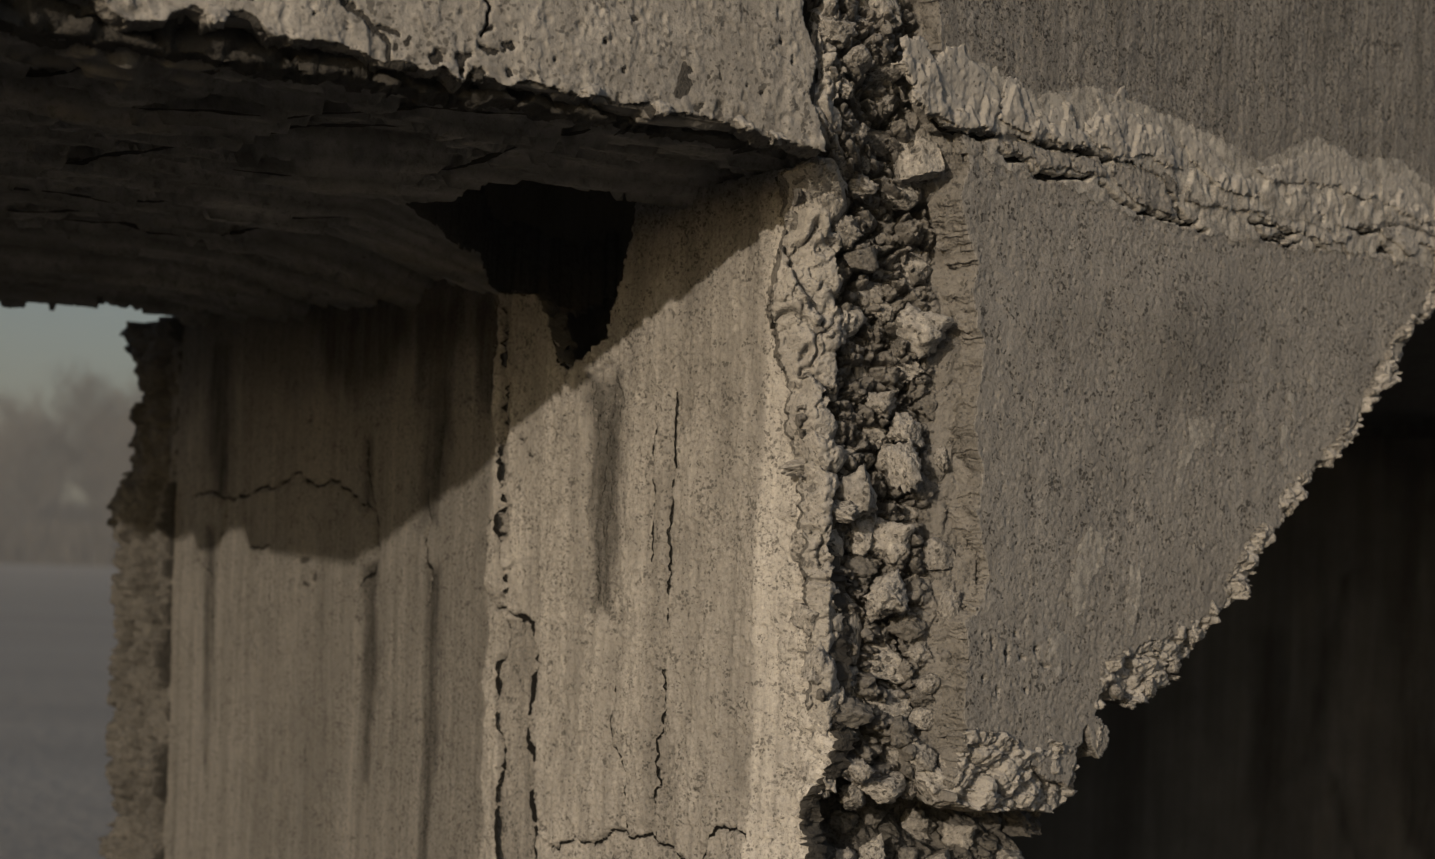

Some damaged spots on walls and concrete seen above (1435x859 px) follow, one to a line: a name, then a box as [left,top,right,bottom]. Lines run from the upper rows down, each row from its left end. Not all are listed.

crack [930,118,1202,233]
crack [1248,222,1395,268]
spalling [765,0,1435,859]
crack [196,460,381,587]
crack [489,305,746,859]